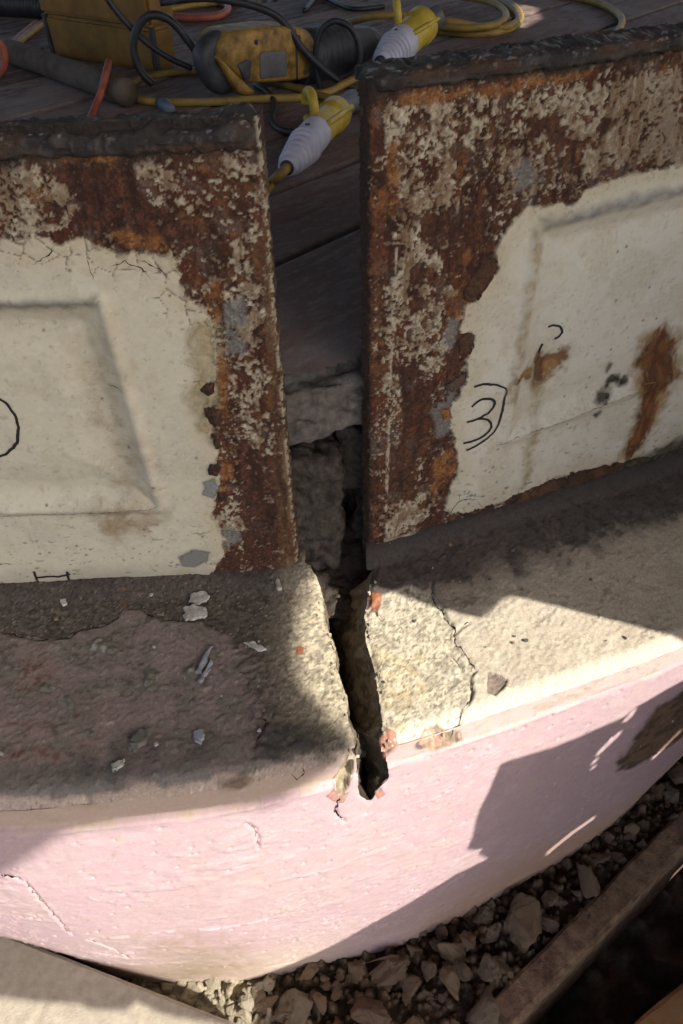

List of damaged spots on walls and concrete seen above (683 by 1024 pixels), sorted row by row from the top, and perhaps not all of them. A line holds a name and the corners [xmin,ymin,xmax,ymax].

corrosion [0,107,300,572]
corrosion [357,50,683,549]
spalling [327,756,355,803]
crack [308,563,388,820]
spalling [381,728,397,757]
spalling [418,726,462,751]
crack [431,584,475,737]
crack [1,874,69,931]